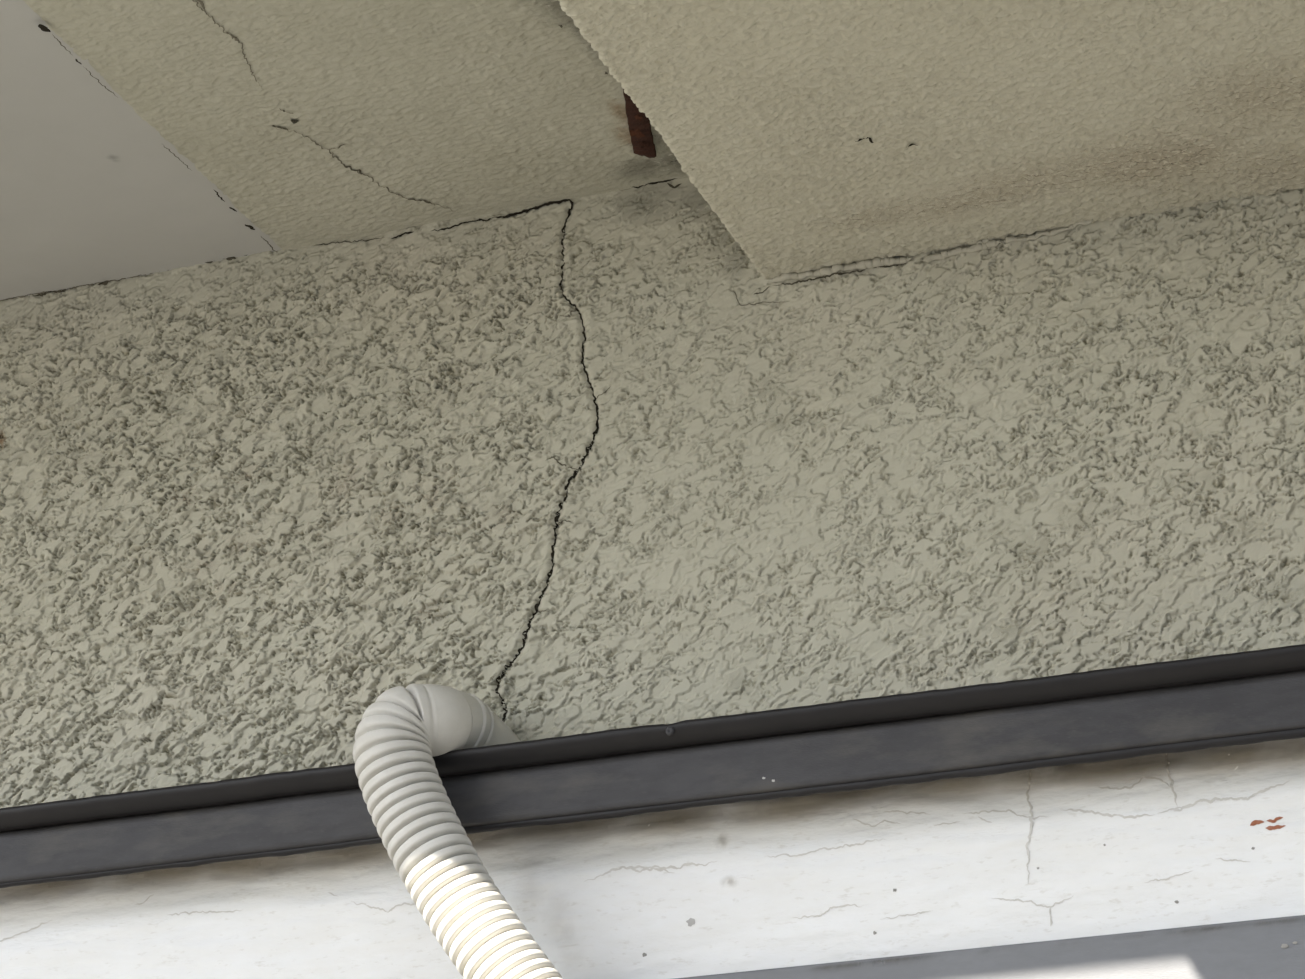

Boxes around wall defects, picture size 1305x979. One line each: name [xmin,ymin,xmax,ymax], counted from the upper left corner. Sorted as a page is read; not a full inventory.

crack [192,0,611,721]
crack [768,753,1288,926]